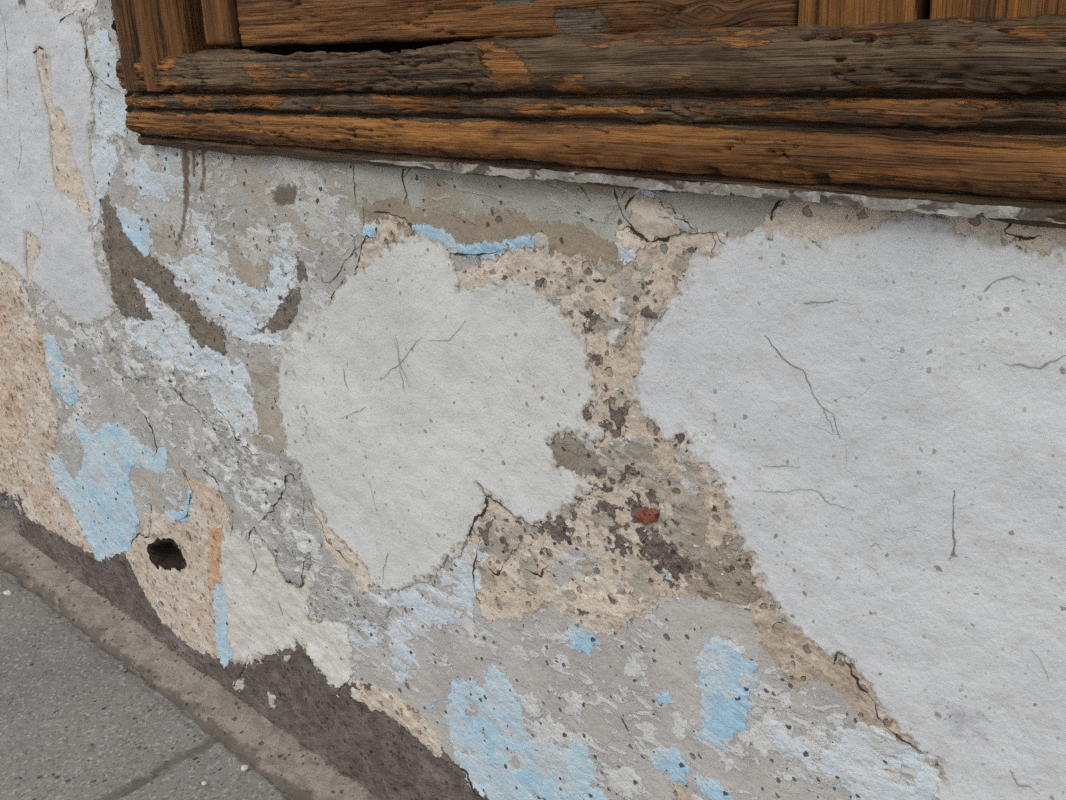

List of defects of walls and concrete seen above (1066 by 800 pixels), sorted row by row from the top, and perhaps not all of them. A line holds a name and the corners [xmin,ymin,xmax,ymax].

water stain [175,149,206,245]
peeling [0,0,489,800]
spalling [346,159,1066,633]
crack [764,335,840,439]
peeling [308,541,942,800]
crack [833,653,921,752]